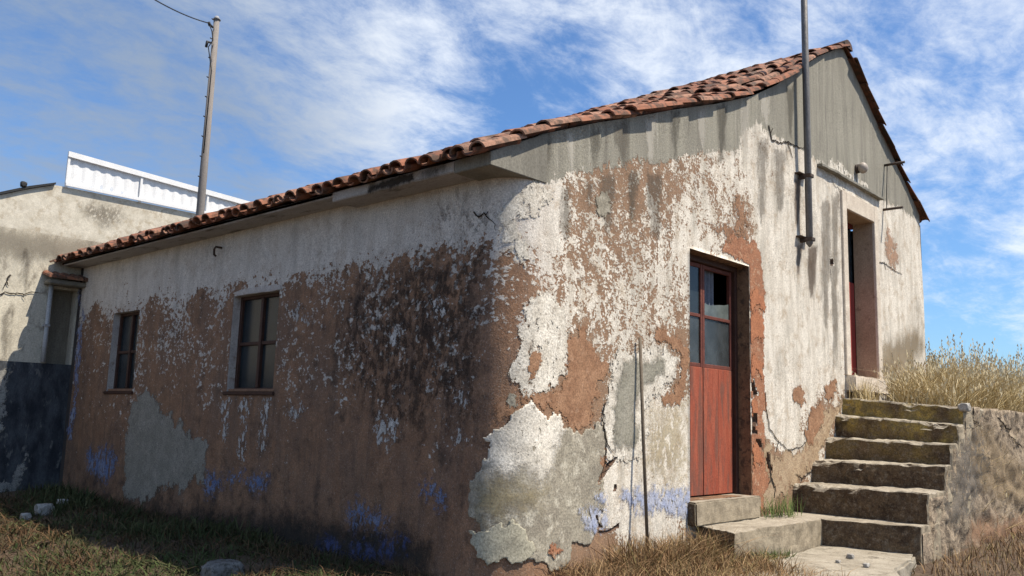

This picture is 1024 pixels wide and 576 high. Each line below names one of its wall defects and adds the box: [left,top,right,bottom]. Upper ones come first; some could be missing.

crack [768,125,804,158]
peeling [885,227,899,270]
crack [0,274,39,299]
peeling [66,289,85,441]
peeling [387,325,405,349]
spalling [710,194,845,515]
peeling [86,388,271,506]
peeling [373,410,401,446]
peeling [468,290,690,572]
crack [601,403,612,478]
crack [765,392,813,498]